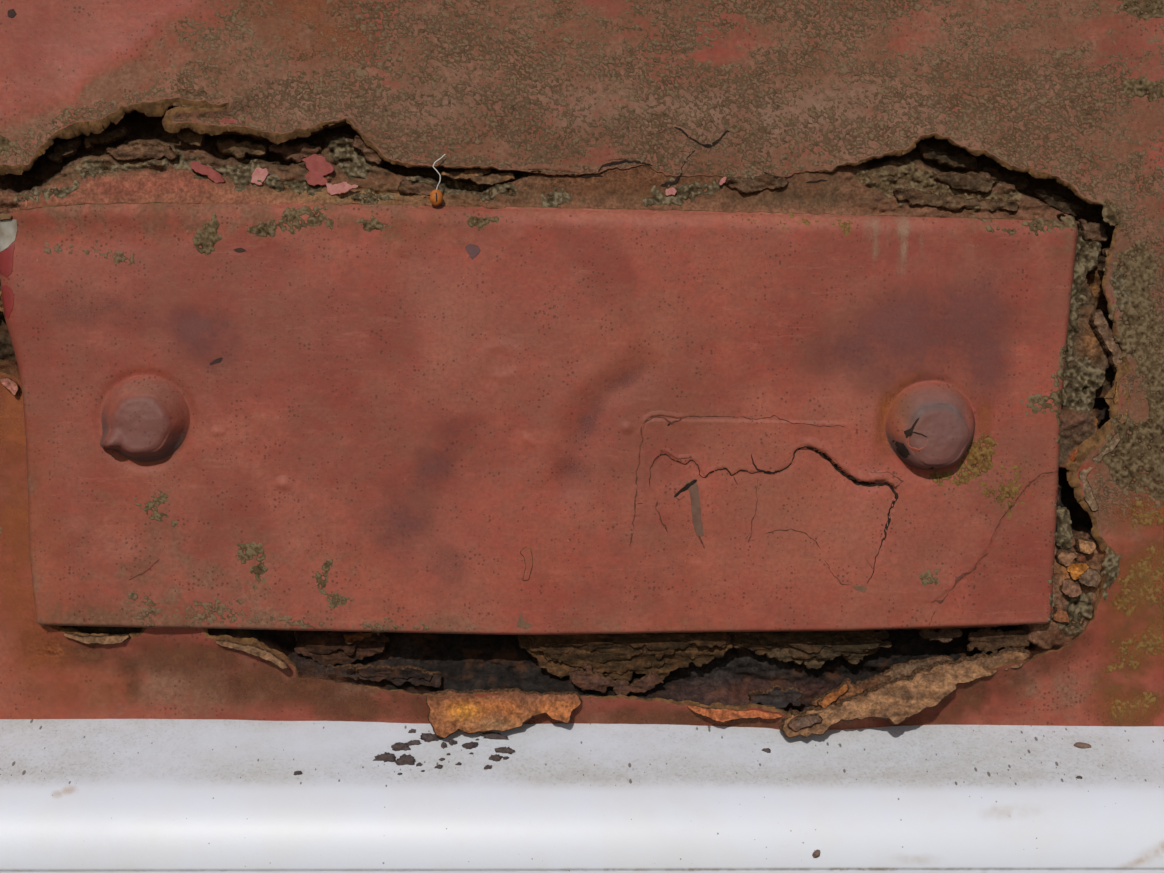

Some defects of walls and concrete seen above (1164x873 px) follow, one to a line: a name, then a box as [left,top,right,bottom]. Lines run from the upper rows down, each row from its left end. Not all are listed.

spalling [0,137,1066,396]
spalling [207,230,1130,738]
peeling [62,626,143,645]